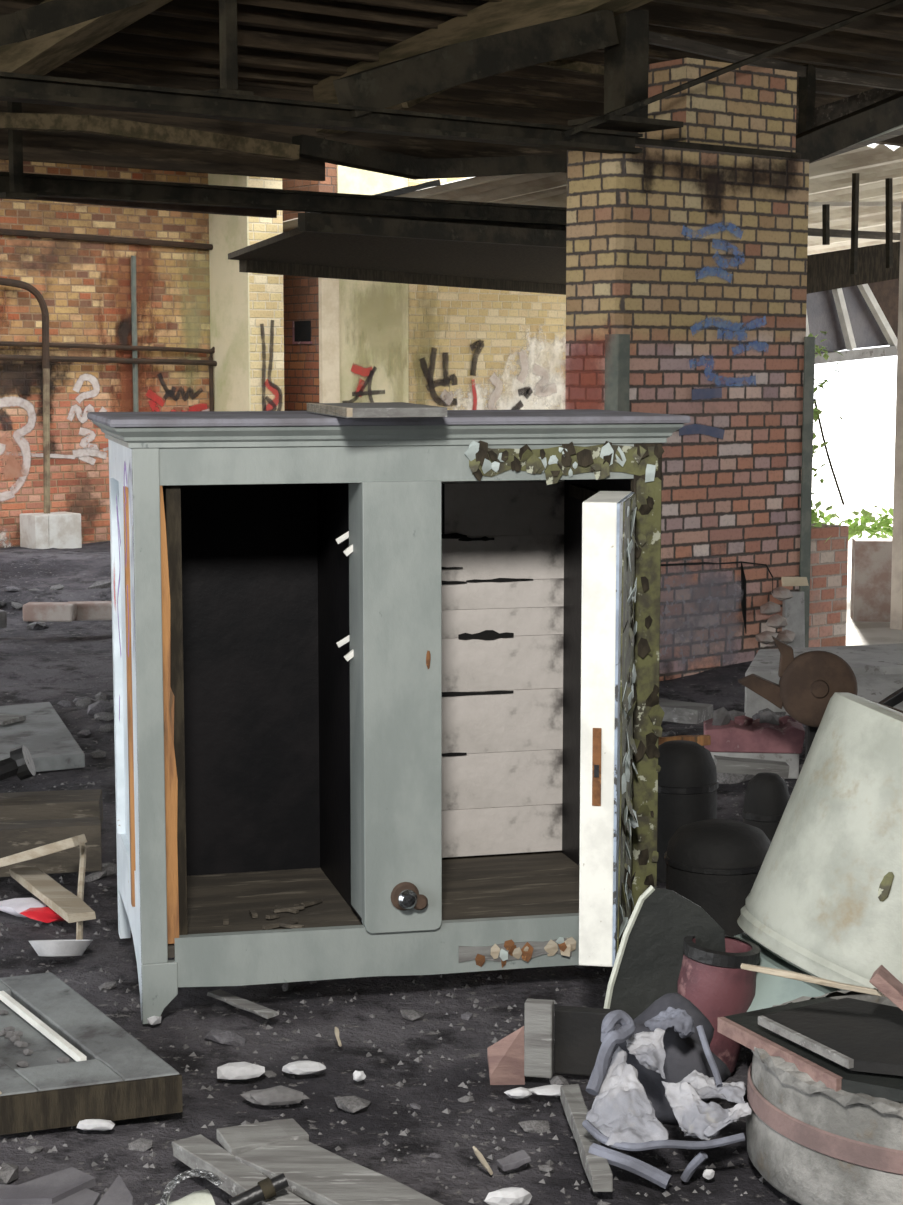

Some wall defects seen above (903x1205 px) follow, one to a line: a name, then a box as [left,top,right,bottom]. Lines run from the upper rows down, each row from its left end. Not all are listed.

damp [644,164,653,193]
damp [706,173,724,215]
peeling [455,337,566,410]